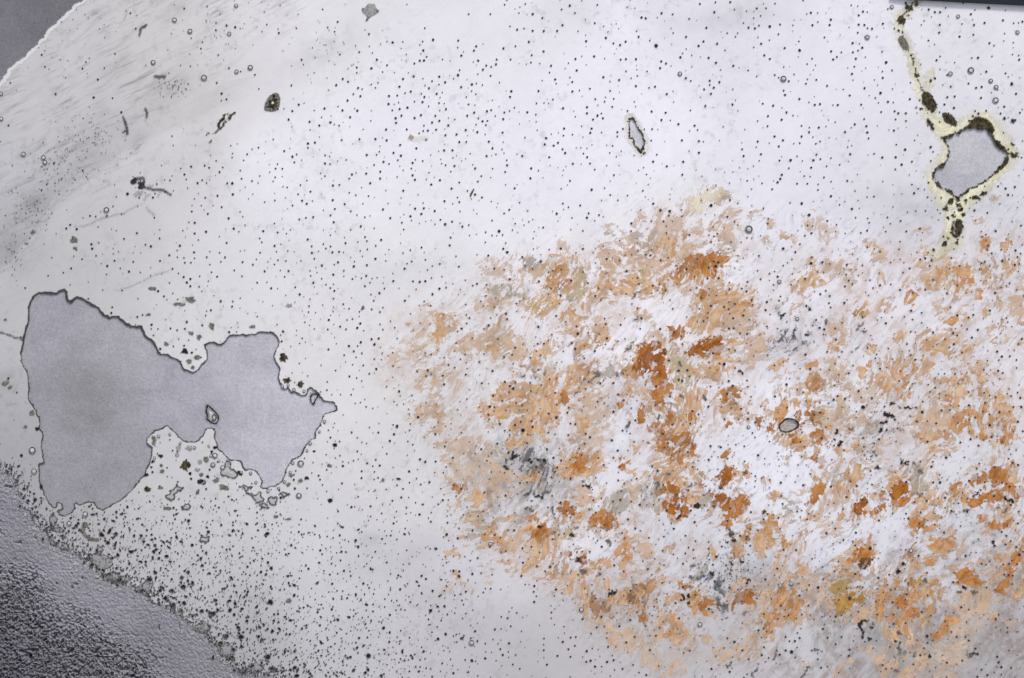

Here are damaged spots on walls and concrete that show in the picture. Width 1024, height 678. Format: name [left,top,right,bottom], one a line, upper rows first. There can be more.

spalling [264,93,280,111]
peeling [625,113,648,155]
crack [893,1,957,130]
peeling [922,109,1019,210]
crack [927,196,966,258]
rust [386,184,1024,678]
spalling [778,418,800,432]
peeling [0,289,338,678]